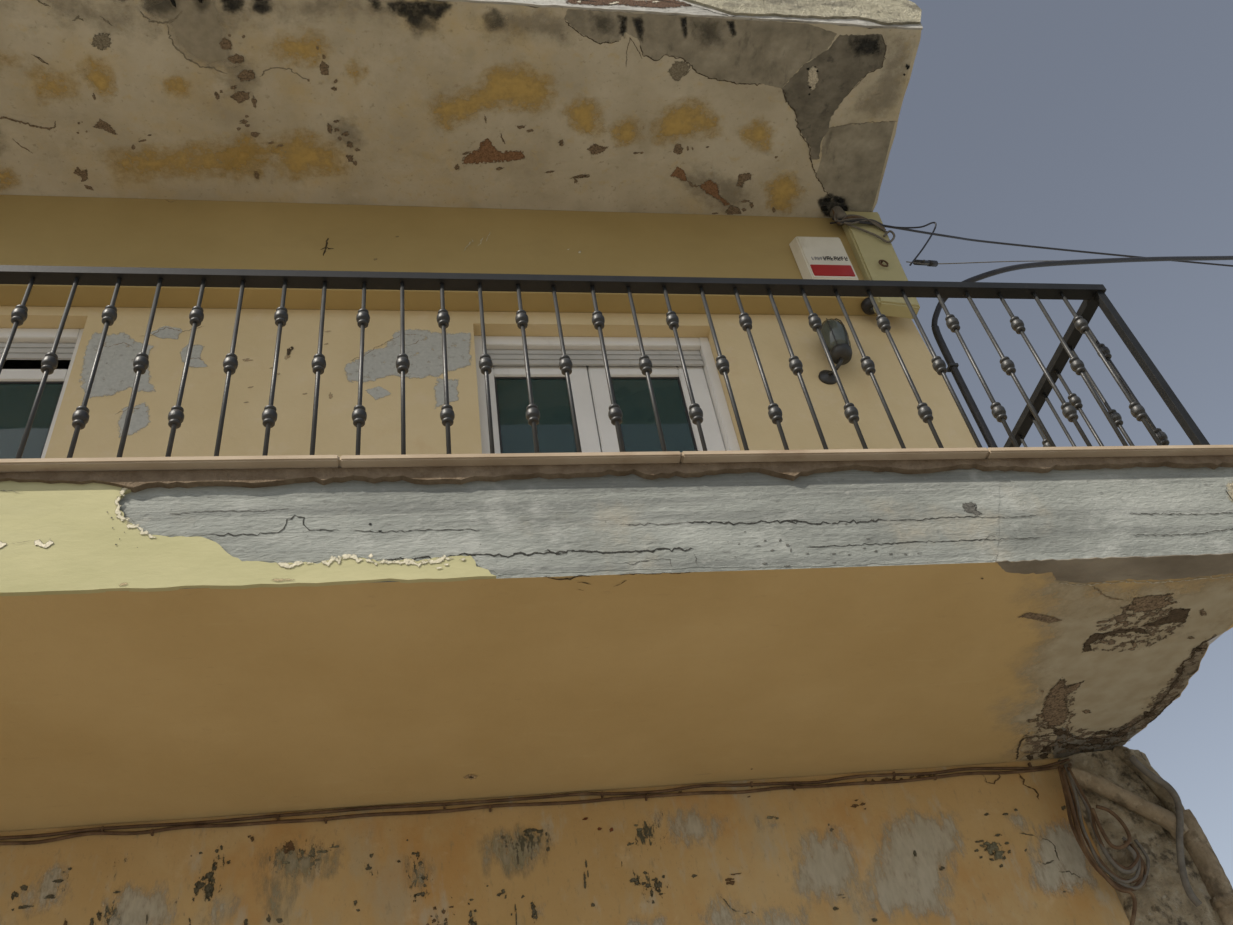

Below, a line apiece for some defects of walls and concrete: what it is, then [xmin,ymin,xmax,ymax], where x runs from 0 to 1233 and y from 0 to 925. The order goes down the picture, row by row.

damp [434,67,554,130]
flaking render [564,0,887,194]
crack [0,116,56,153]
damp [117,135,340,179]
peeling [454,134,525,170]
peeling [671,144,754,215]
peeling [79,326,207,437]
peeling [345,329,471,407]
crack [170,508,1036,566]
crack [1130,512,1232,536]
spalling [106,469,1233,760]